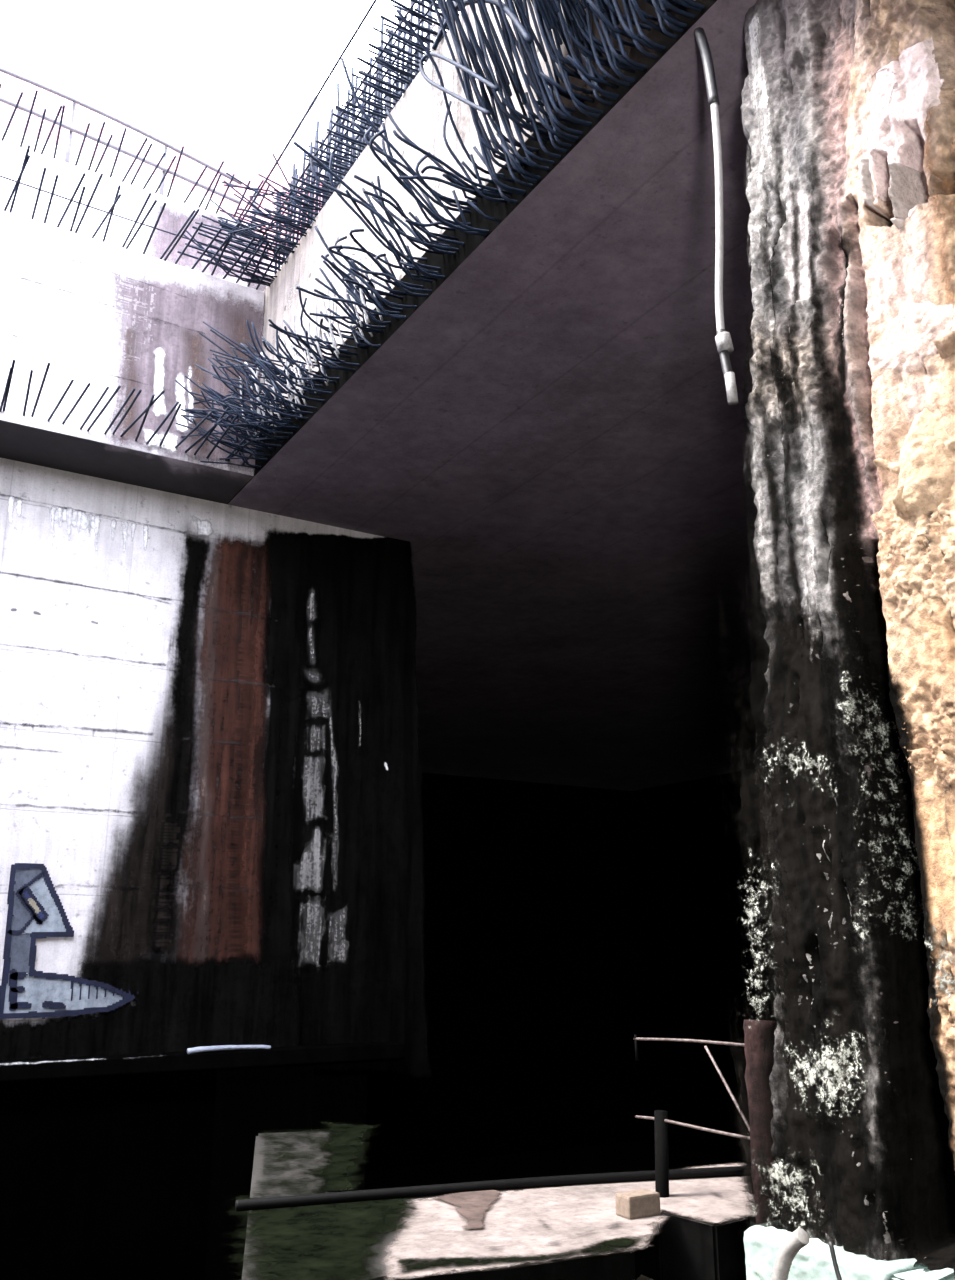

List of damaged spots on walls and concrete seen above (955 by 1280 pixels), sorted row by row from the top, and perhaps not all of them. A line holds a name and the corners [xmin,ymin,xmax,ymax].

spalling [0,0,705,467]
flaking render [858,37,944,229]
spalling [868,301,955,373]
water stain [0,517,431,1078]
corrosion [177,536,270,965]
water stain [738,15,955,1280]